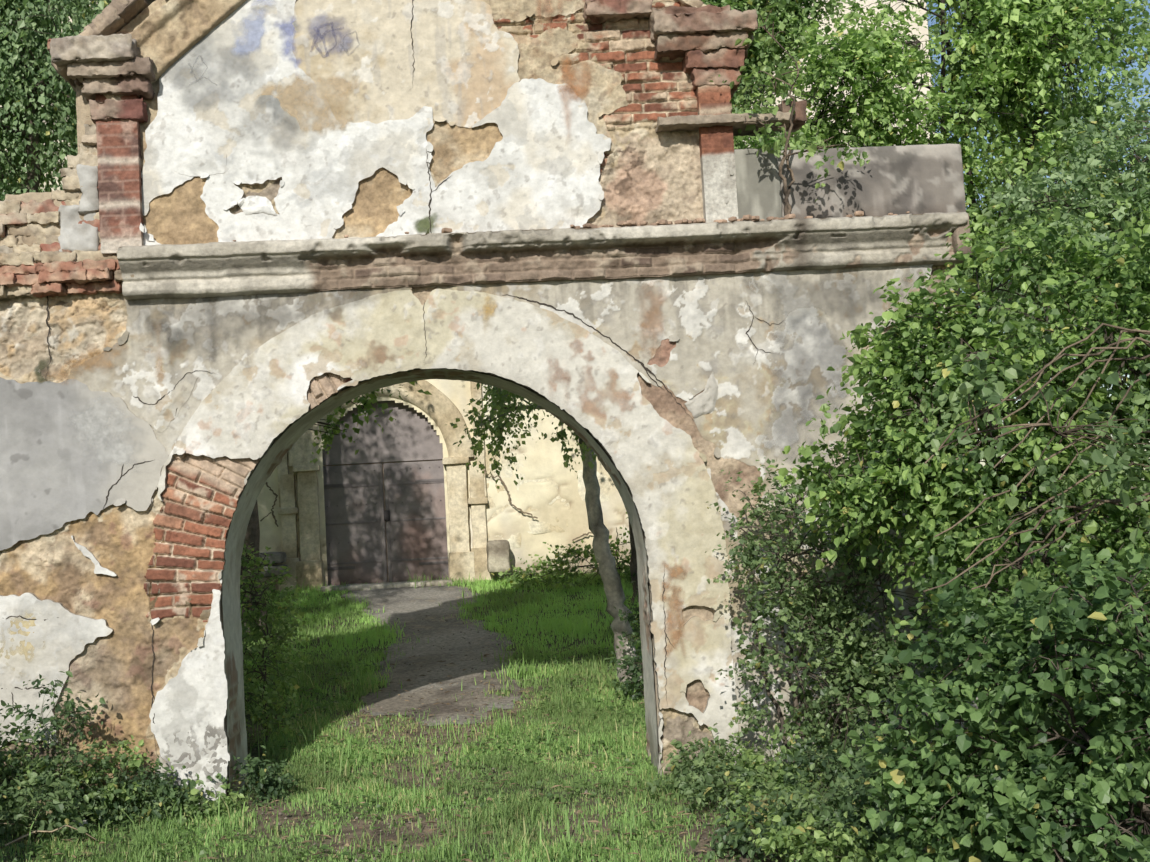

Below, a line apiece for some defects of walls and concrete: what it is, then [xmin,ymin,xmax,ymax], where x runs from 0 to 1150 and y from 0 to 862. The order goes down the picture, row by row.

spalling [0,450,261,804]